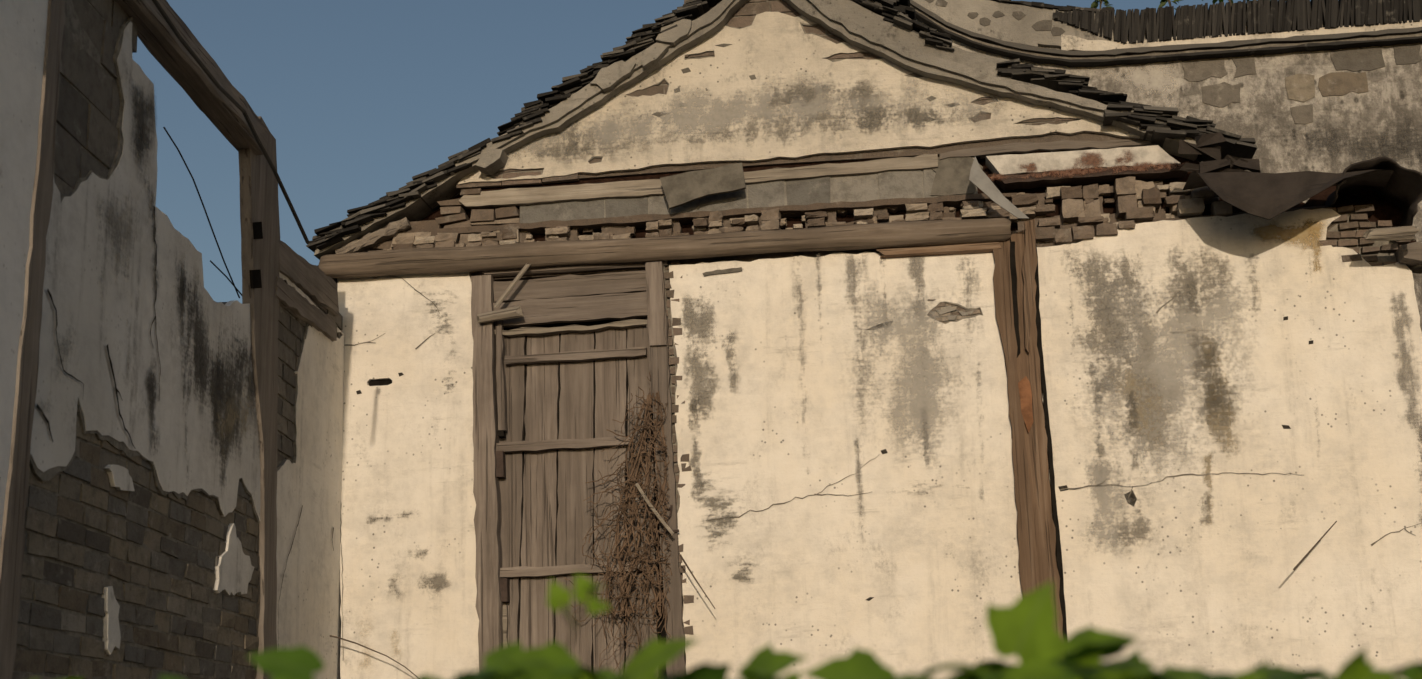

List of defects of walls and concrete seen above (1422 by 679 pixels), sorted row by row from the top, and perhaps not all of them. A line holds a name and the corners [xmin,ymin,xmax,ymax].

flaking render [54,0,138,202]
damp [133,86,155,164]
damp [511,82,943,156]
damp [1292,124,1422,170]
flaking render [12,400,260,679]
damp [147,372,158,440]
damp [179,265,259,480]
damp [683,298,737,500]
crack [708,454,880,521]
damp [847,256,949,461]
flaking render [916,299,983,324]
damp [1073,253,1237,547]